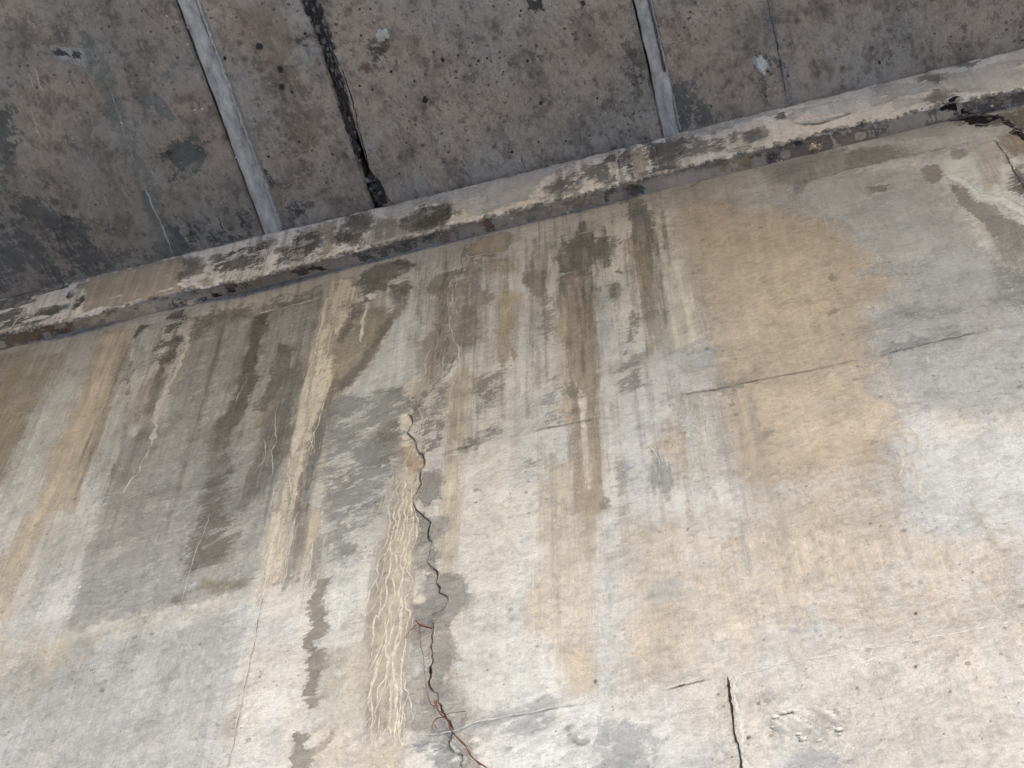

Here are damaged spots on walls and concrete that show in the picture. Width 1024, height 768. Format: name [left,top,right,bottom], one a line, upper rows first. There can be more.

leakage [0,44,656,768]
crack [405,181,492,768]
leakage [522,74,1024,512]
spalling [940,96,1024,141]
crack [727,676,742,768]